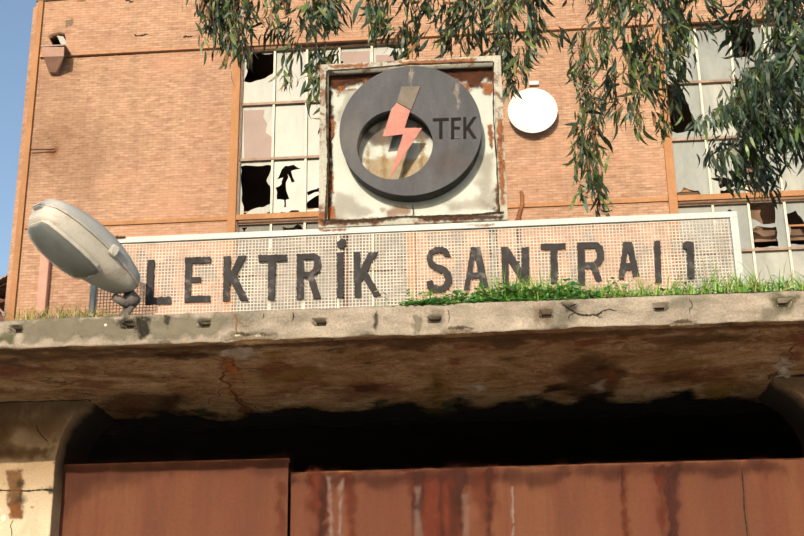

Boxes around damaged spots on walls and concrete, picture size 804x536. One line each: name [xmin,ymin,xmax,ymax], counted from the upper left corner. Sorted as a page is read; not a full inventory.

water stain [0,309,804,355]
crack [563,303,617,319]
water stain [106,394,183,416]
crack [208,355,260,415]
corrosion [0,448,48,459]
corrosion [6,470,23,519]
corrosion [306,472,328,536]
corrosion [410,467,466,536]